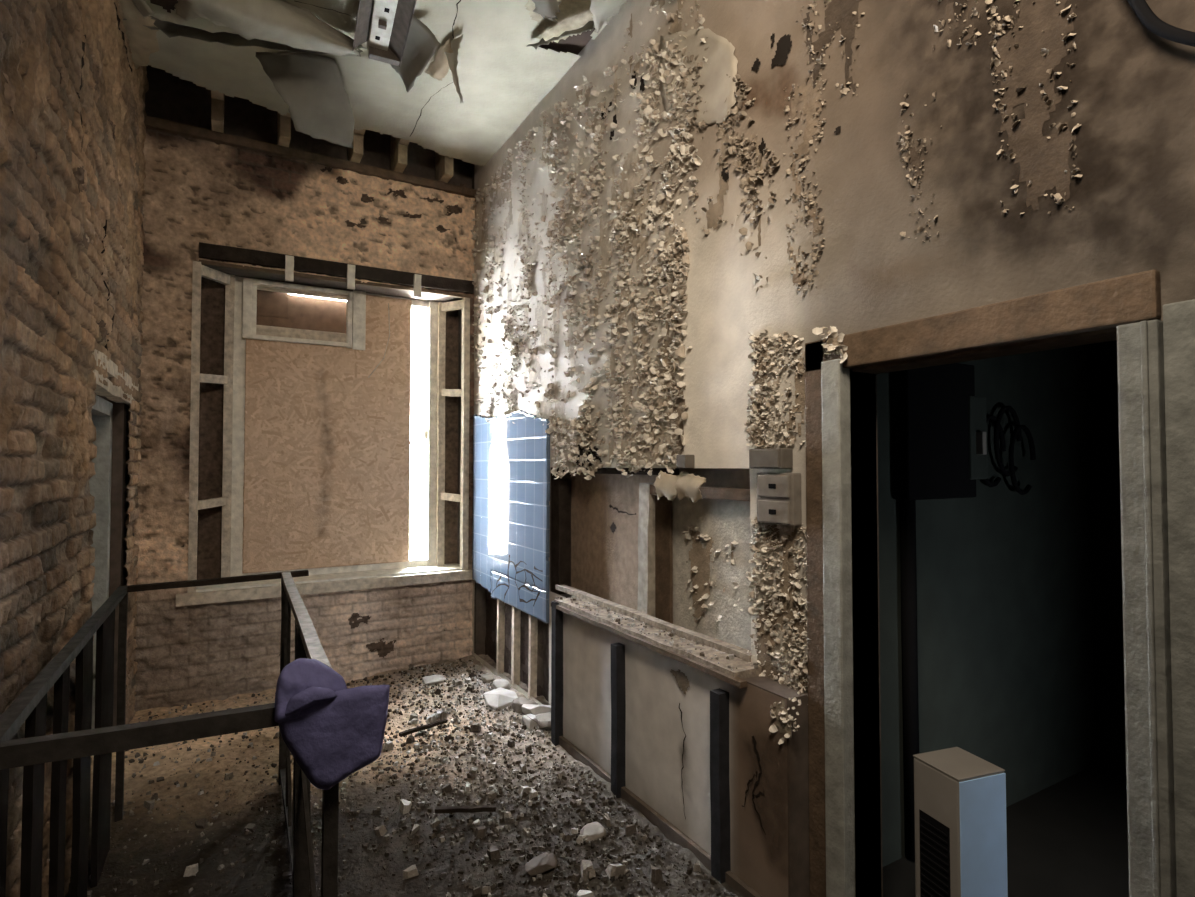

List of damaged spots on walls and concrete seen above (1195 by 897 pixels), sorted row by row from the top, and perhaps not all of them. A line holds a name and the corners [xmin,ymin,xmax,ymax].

peeling [345,0,865,480]
peeling [896,91,939,242]
peeling [933,0,1082,214]
crack [490,555,543,606]
crack [742,736,766,835]